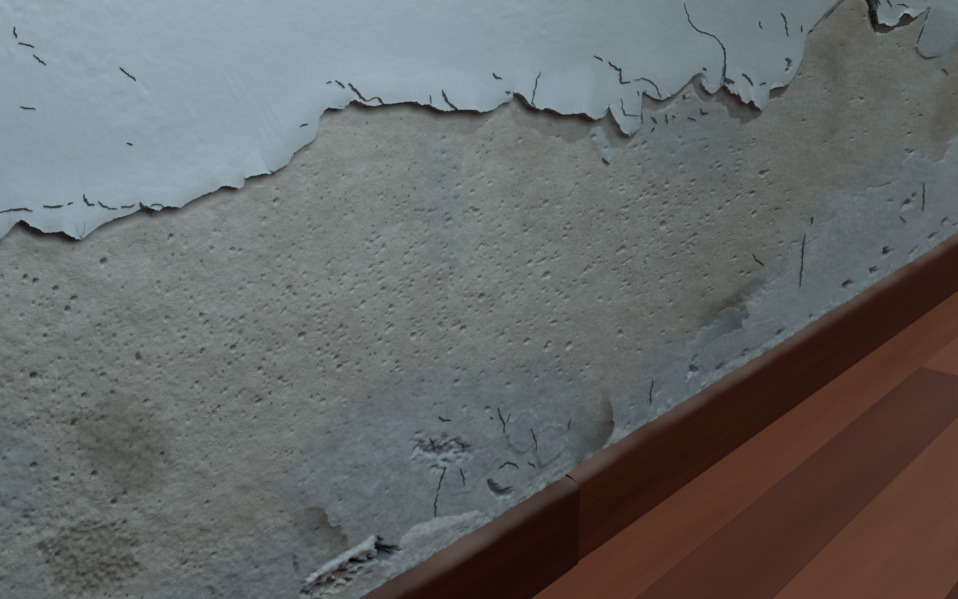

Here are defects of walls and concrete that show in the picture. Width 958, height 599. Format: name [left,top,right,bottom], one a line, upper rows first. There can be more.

crack [684,3,766,85]
peeling [319,68,511,117]
peeling [512,63,605,120]
peeling [724,60,769,111]
peeling [7,200,81,240]
peeling [81,148,271,240]
efflorescence [742,149,933,337]
damp [611,323,732,439]
efflorescence [297,364,589,568]
flaking render [384,449,571,569]
flaking render [302,535,375,586]
flaking render [381,530,460,584]